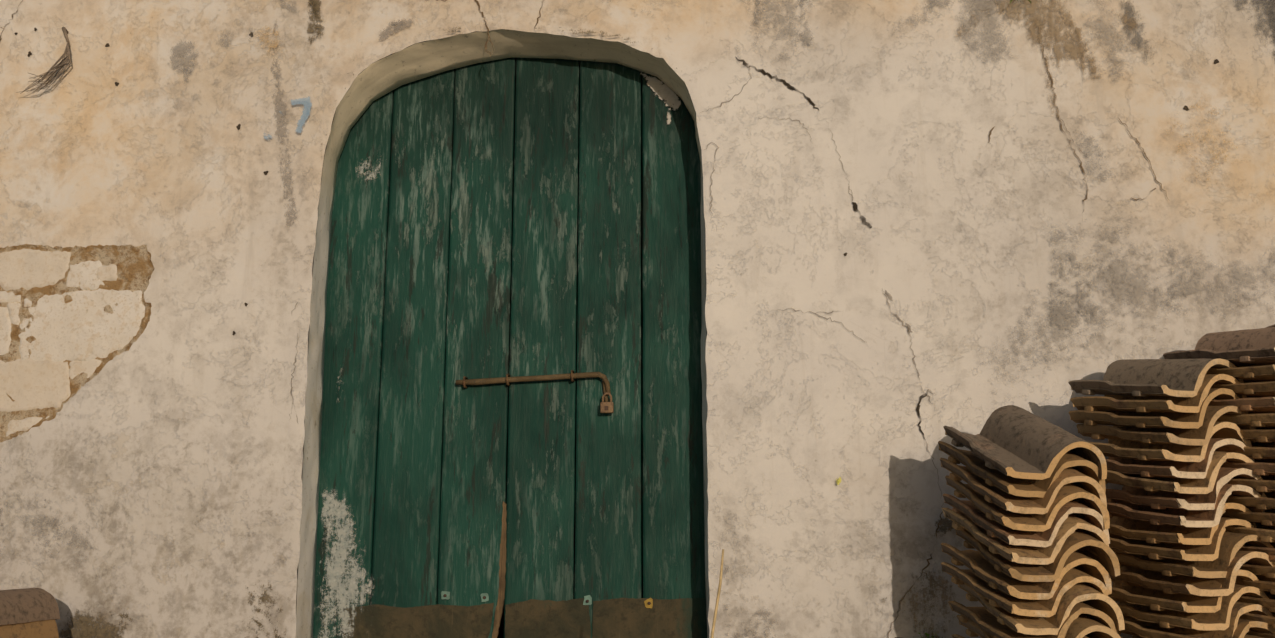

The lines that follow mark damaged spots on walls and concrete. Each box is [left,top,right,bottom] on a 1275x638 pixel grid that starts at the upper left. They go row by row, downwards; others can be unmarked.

damp [282,0,324,43]
damp [1237,0,1275,55]
damp [271,24,297,224]
crack [702,56,872,228]
crack [1040,43,1088,220]
crack [1119,119,1169,201]
flaking render [0,244,155,442]
crack [883,291,938,474]
crack [888,505,955,638]